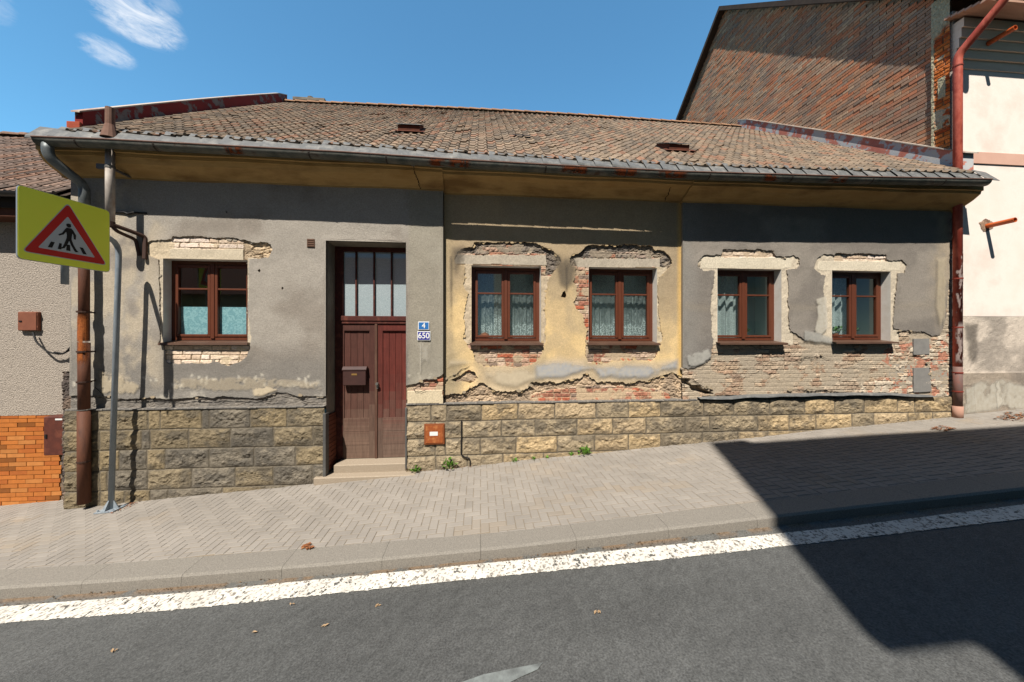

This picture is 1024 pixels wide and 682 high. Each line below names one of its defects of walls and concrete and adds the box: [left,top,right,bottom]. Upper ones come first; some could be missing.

spalling [931,0,951,149]
spalling [148,236,272,366]
spalling [406,212,963,404]
crack [92,387,318,403]